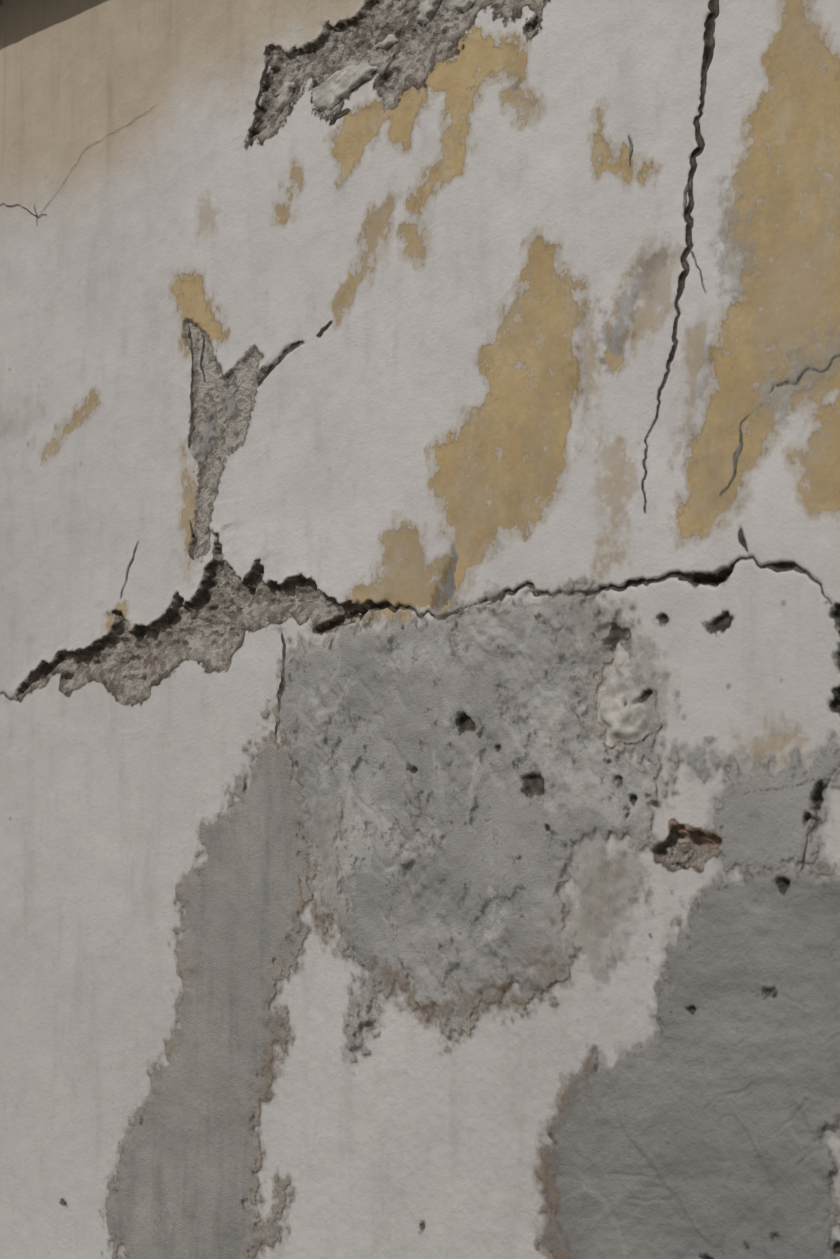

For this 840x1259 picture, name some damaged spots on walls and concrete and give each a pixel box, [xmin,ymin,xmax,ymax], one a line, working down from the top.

crack [641,0,719,513]
peeling [676,0,840,539]
peeling [15,0,588,706]
crack [719,354,840,496]
crack [120,541,138,597]
crack [361,527,840,635]
crack [275,634,285,735]
spalling [449,713,483,746]
spalling [591,622,630,650]
spalling [521,773,544,798]
spalling [652,818,722,872]
crack [740,764,840,874]